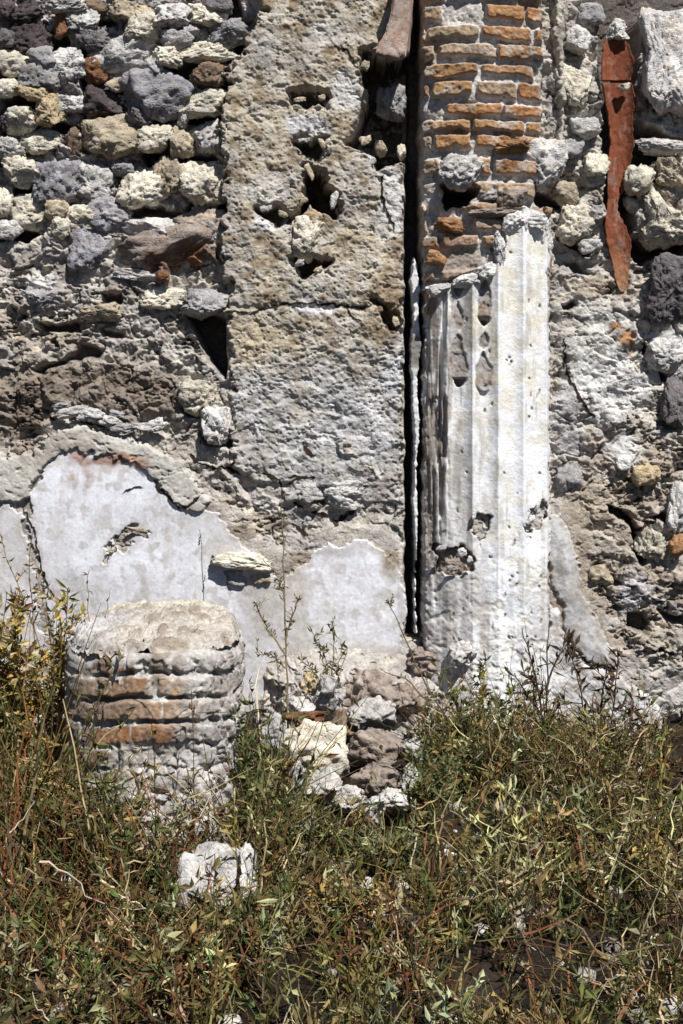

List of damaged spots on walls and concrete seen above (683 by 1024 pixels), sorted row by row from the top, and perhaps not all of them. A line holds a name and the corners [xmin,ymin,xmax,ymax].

crack [225,301,370,321]
spalling [109,524,148,554]
spalling [471,510,490,538]
spalling [525,502,547,532]
spalling [432,543,475,574]